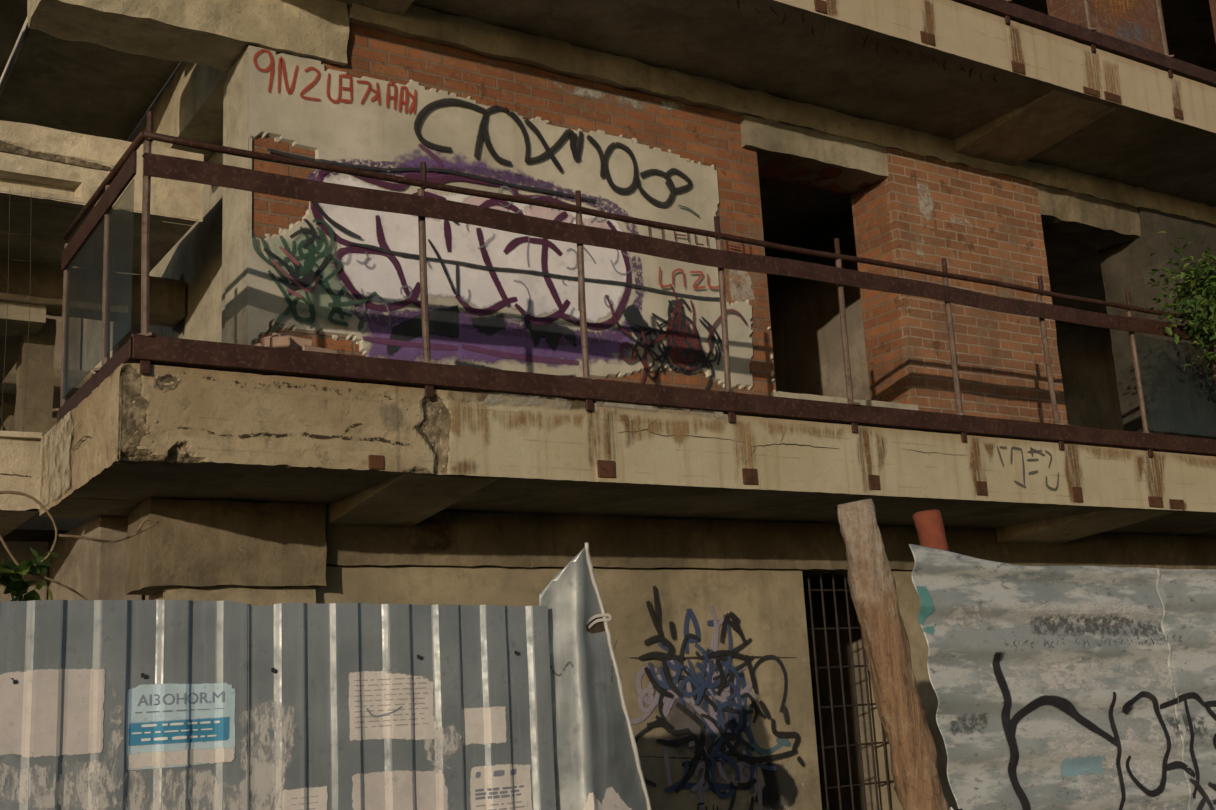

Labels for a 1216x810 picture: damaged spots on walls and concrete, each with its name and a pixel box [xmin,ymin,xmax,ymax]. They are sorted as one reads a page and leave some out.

corrosion [1010,27,1024,64]
flaking render [253,137,316,180]
flaking render [322,25,763,256]
flaking render [253,192,309,239]
flaking render [253,325,364,356]
flaking render [597,268,774,396]
spalling [117,365,203,463]
spalling [396,386,451,474]
corrosion [859,428,885,475]
corrosion [971,438,993,486]